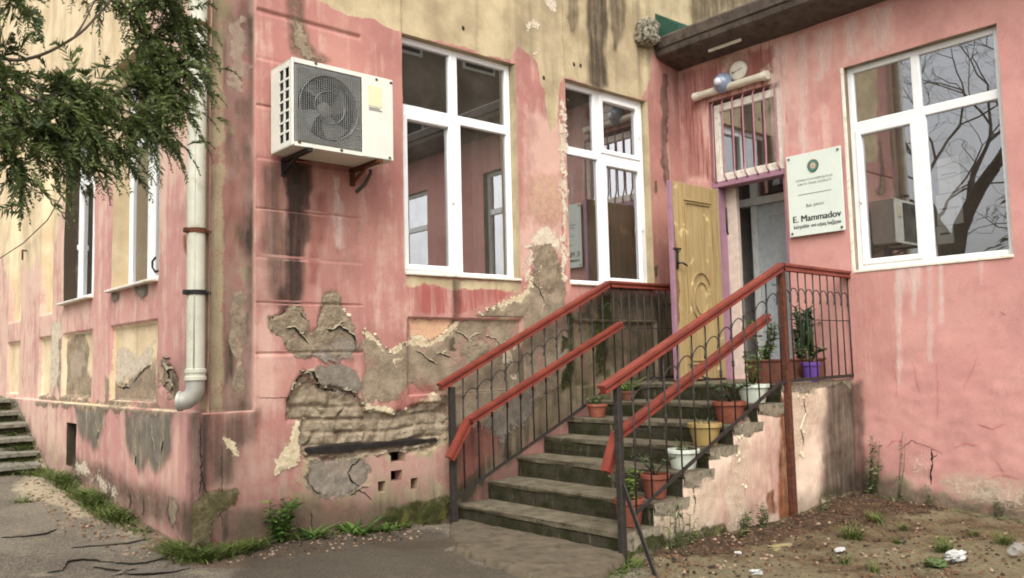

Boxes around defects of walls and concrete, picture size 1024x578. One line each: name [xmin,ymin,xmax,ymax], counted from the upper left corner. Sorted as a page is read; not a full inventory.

leakage [587,0,623,89]
leakage [271,159,321,313]
peeling [267,100,571,461]
peeling [35,312,179,417]
leakage [73,414,243,547]
flaking render [222,436,239,457]
crack [904,440,942,484]